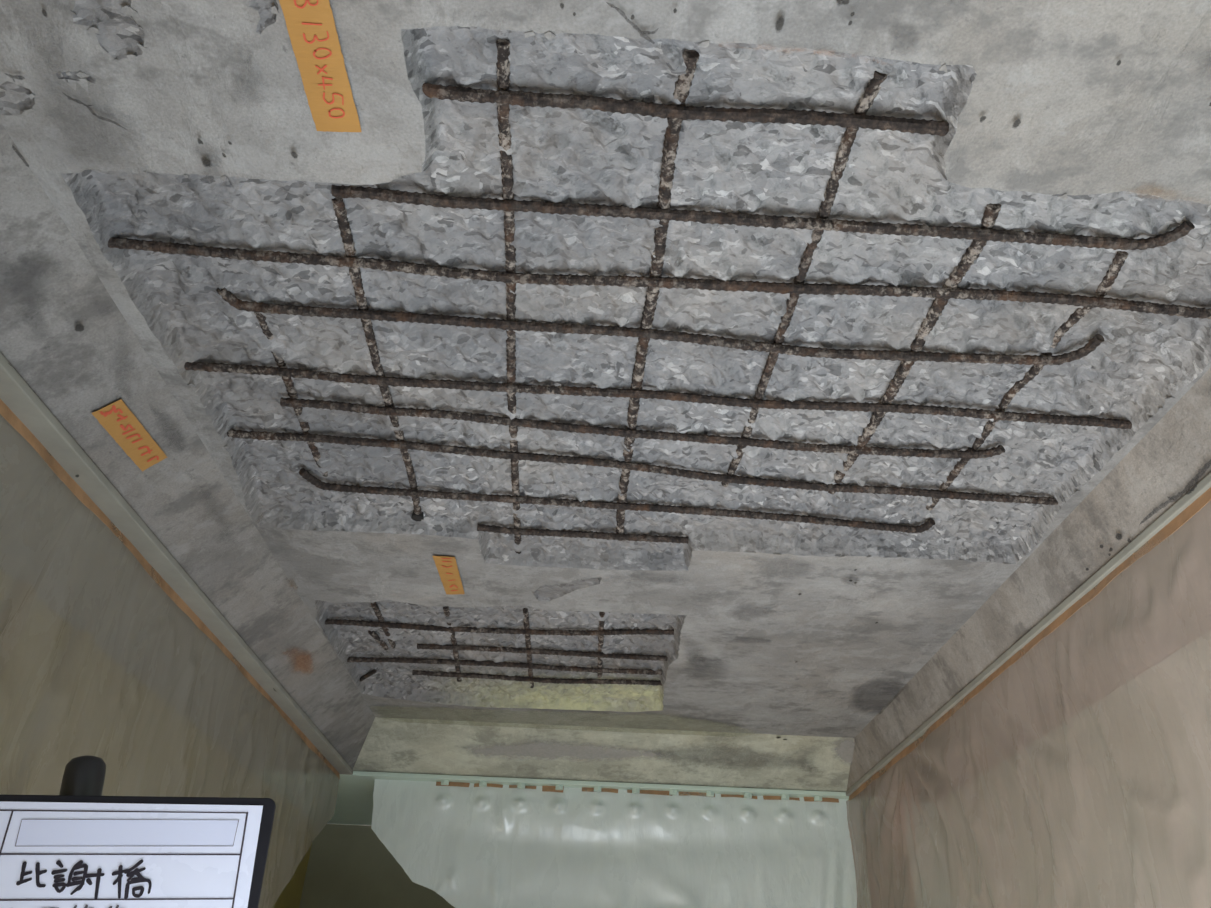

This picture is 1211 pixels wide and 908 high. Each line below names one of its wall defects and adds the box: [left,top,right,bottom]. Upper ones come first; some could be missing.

spalling [56,26,1211,712]